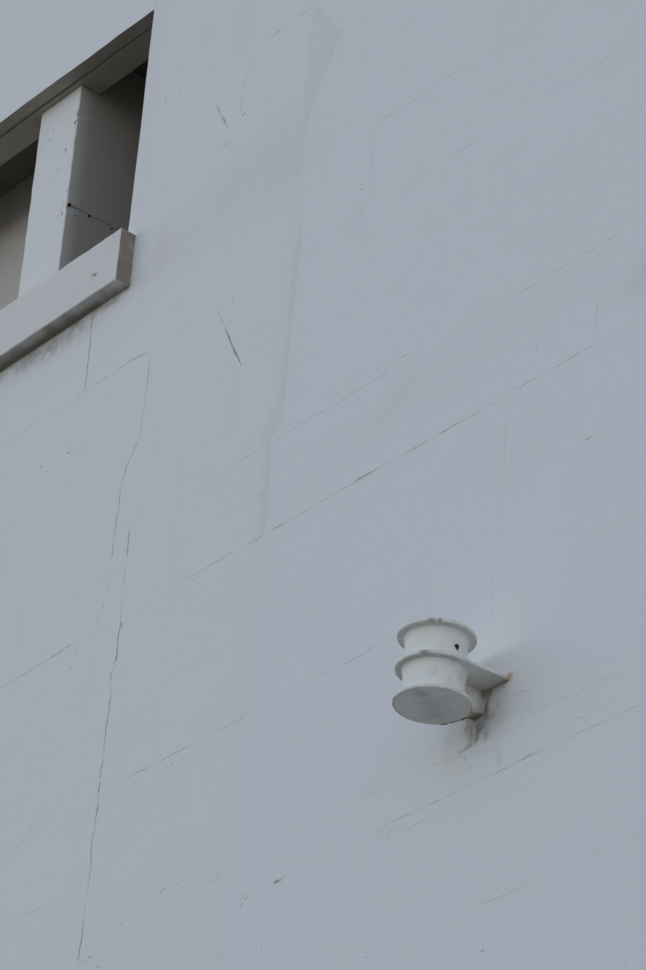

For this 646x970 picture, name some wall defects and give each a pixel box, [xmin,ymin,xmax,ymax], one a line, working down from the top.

crack [185,317,645,579]
crack [49,312,414,970]
crack [374,702,645,836]